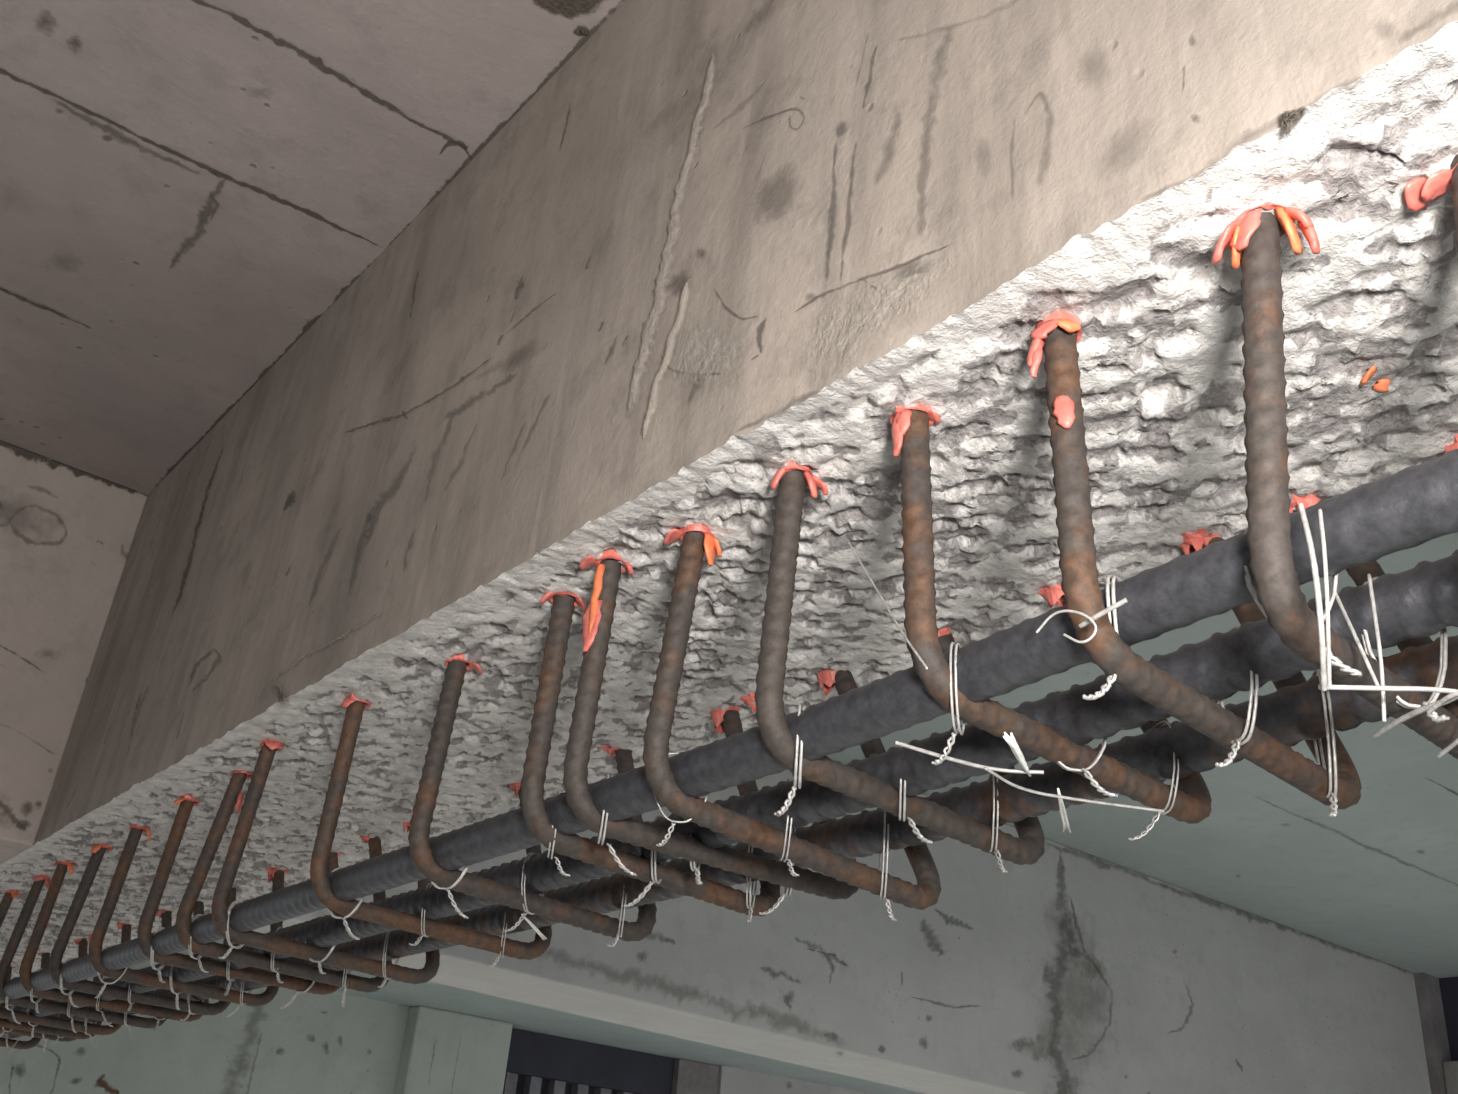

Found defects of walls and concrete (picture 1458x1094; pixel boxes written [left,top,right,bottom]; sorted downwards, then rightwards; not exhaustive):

spalling [1279,107,1307,135]
crack [171,181,224,267]
peeling [1211,207,1320,269]
crack [0,288,89,327]
peeling [1027,318,1082,378]
peeling [1053,395,1075,429]
peeling [574,556,633,652]
spalling [1101,530,1390,747]
spalling [1289,449,1458,701]
spalling [943,604,1244,782]
spalling [669,667,1118,859]
spalling [0,765,809,1039]